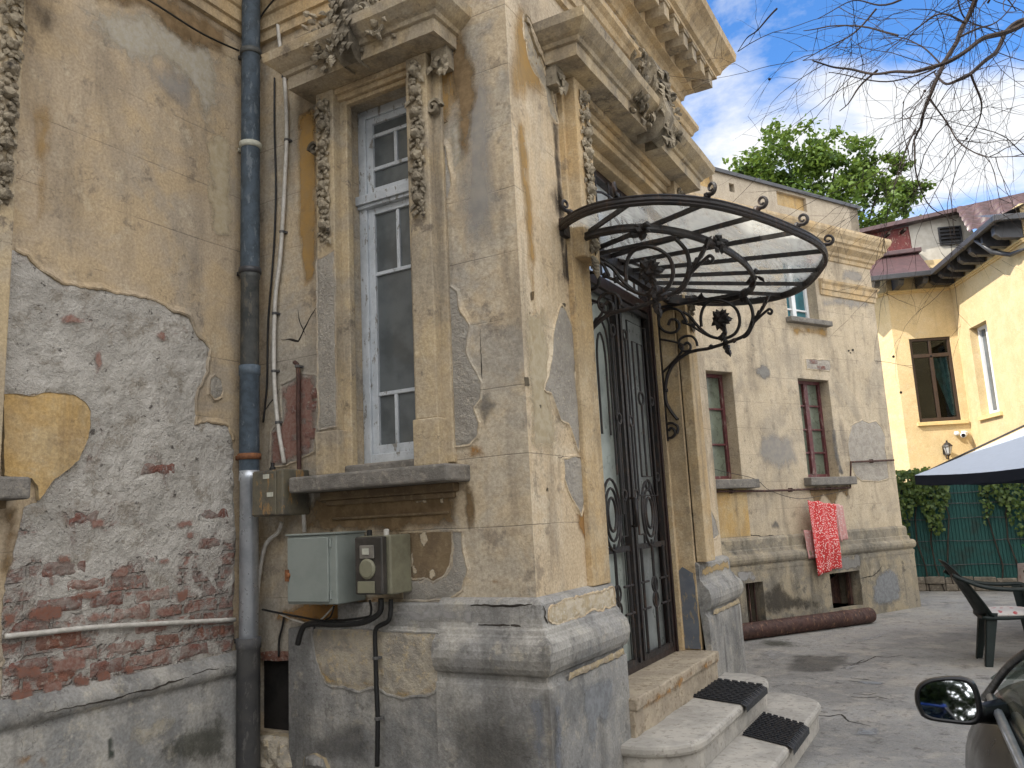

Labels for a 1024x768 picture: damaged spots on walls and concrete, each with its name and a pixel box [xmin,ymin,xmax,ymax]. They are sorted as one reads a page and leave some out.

damp [93,0,224,111]
crack [282,308,316,342]
flaking render [450,283,485,450]
flaking render [544,302,584,517]
flaking render [0,246,236,700]
flaking render [846,419,889,483]
peeling [399,529,471,602]
crack [470,604,548,627]
peeling [679,561,729,649]
crack [47,666,232,713]
peeling [309,625,442,702]